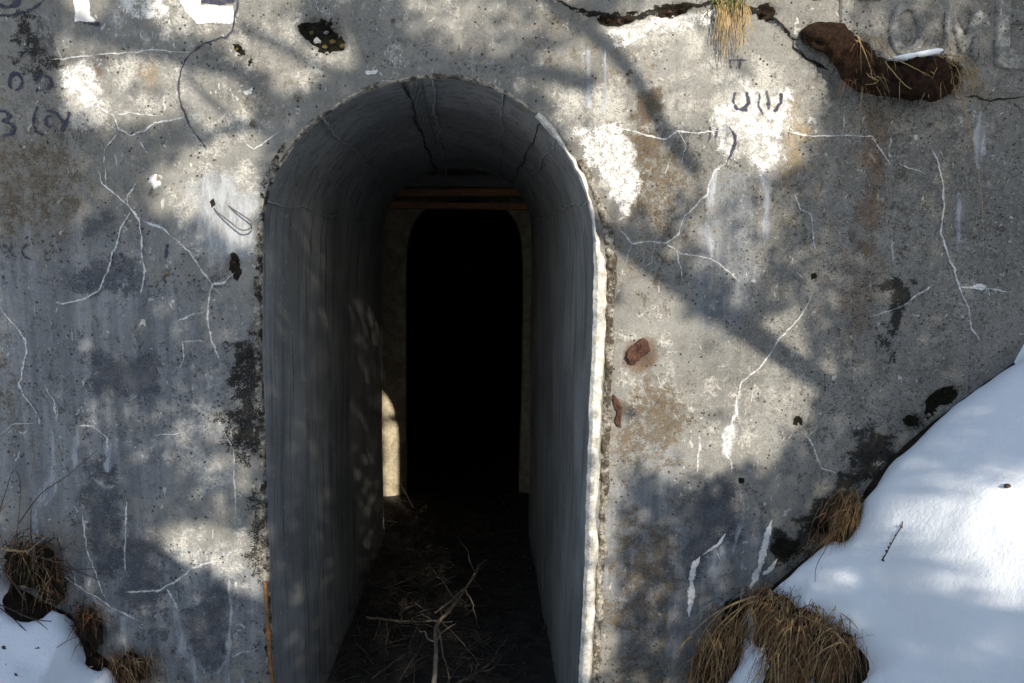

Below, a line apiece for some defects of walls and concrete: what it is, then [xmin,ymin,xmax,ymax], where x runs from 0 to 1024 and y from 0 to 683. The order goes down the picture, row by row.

spalling [297,18,345,55]
peeling [600,2,721,49]
spalling [757,3,776,22]
crack [55,0,239,371]
crack [606,108,1006,340]
crack [0,307,108,450]
spalling [570,122,643,683]
corrosion [612,394,622,428]
corrosion [626,338,651,365]
crack [737,293,813,399]
crack [219,423,236,510]
crack [65,503,217,621]